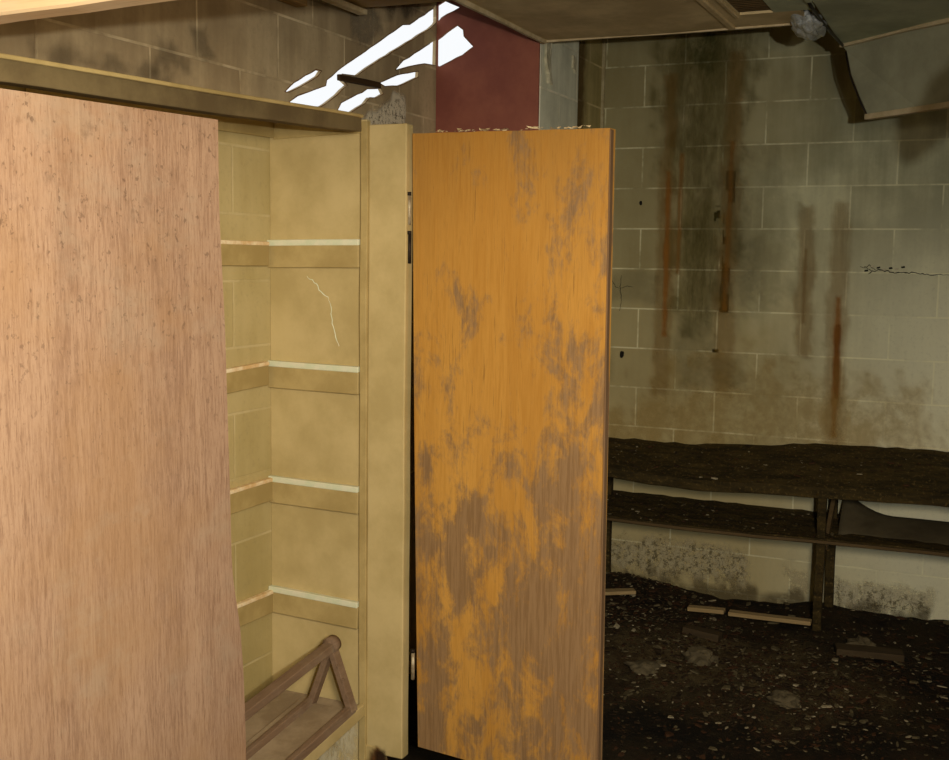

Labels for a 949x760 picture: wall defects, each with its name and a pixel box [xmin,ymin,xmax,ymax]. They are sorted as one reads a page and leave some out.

rust [832,298,840,436]
water stain [611,538,756,601]
water stain [834,582,933,620]